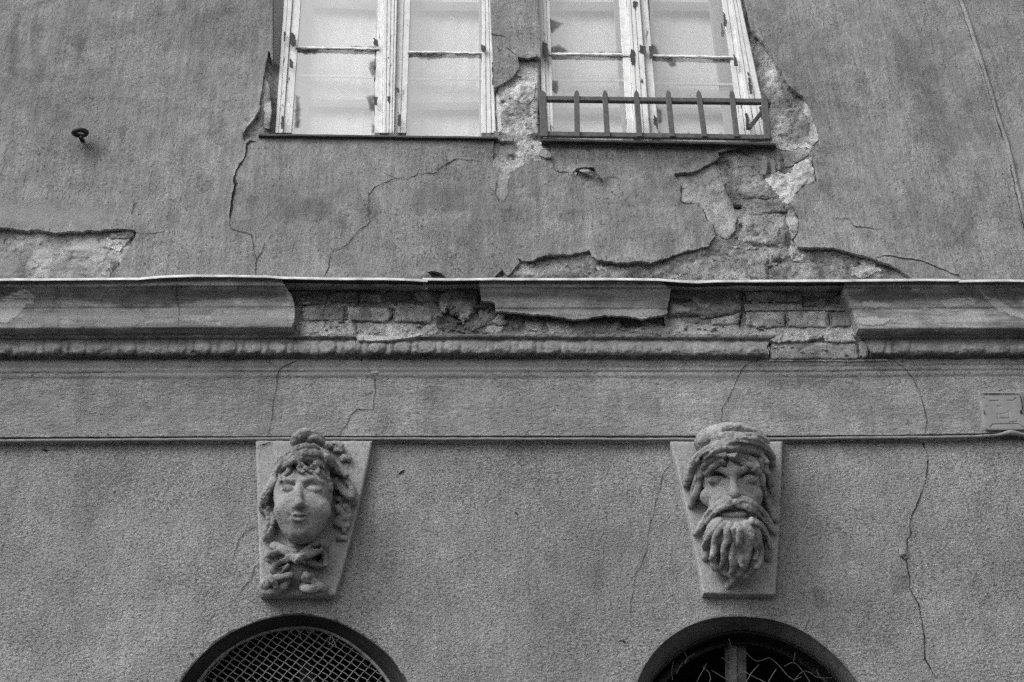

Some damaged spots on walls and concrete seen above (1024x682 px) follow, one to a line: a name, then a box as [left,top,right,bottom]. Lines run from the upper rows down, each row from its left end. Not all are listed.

flaking render [242,31,296,141]
flaking render [0,229,136,278]
crack [227,137,264,272]
crack [323,158,478,277]
flaking render [288,14,908,362]
crack [895,361,937,678]